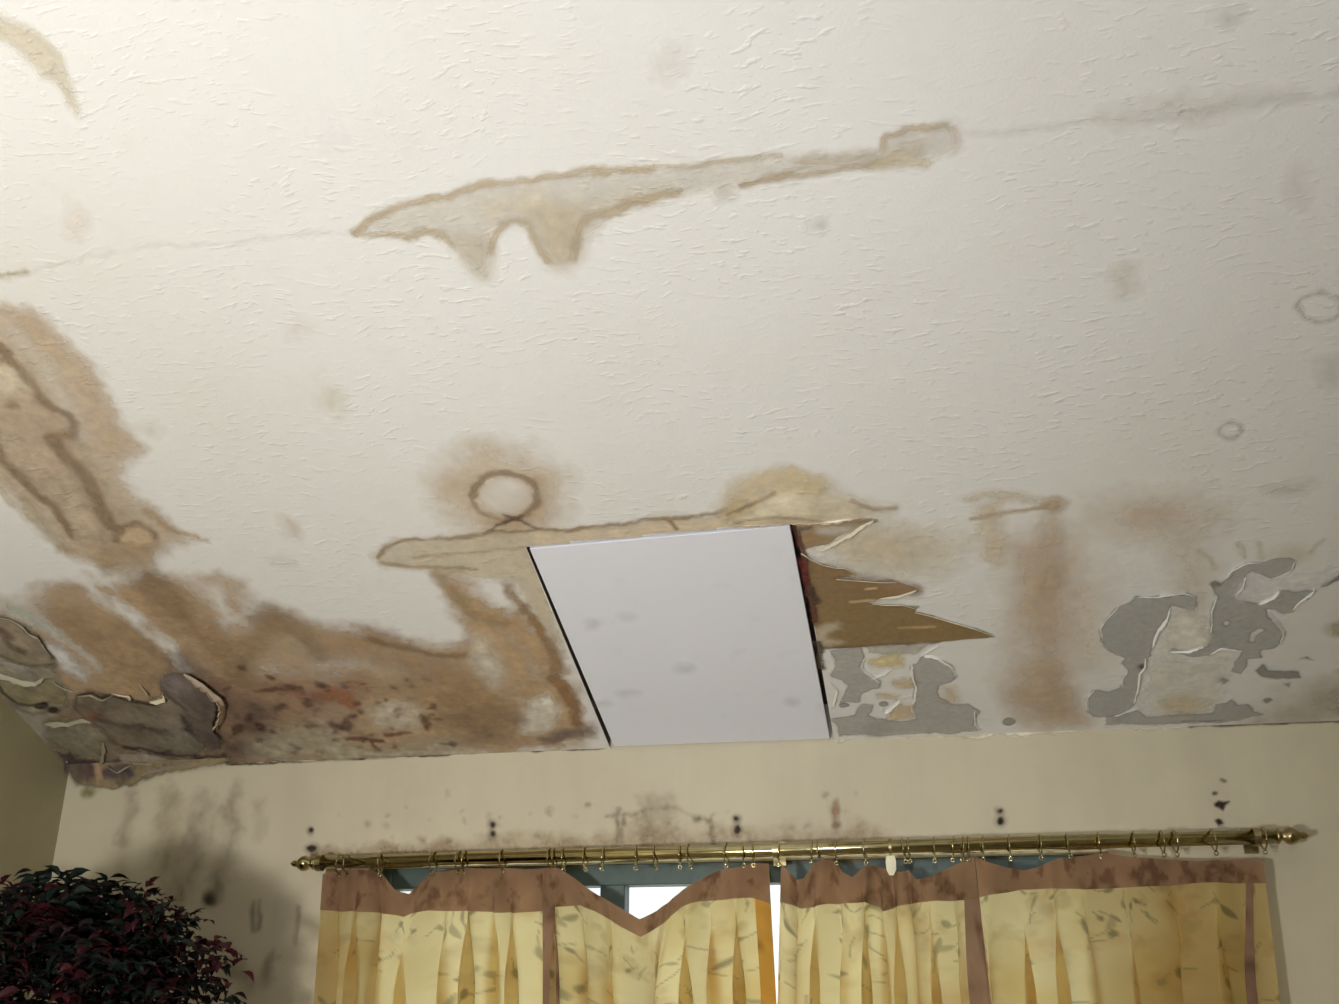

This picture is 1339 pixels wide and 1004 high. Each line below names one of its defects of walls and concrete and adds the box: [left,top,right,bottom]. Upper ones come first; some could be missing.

water stain [0,20,74,105]
water stain [354,125,956,265]
water stain [0,306,741,763]
spalling [0,615,227,795]
peeling [828,644,981,736]
water stain [1014,553,1076,722]
peeling [1086,558,1339,725]